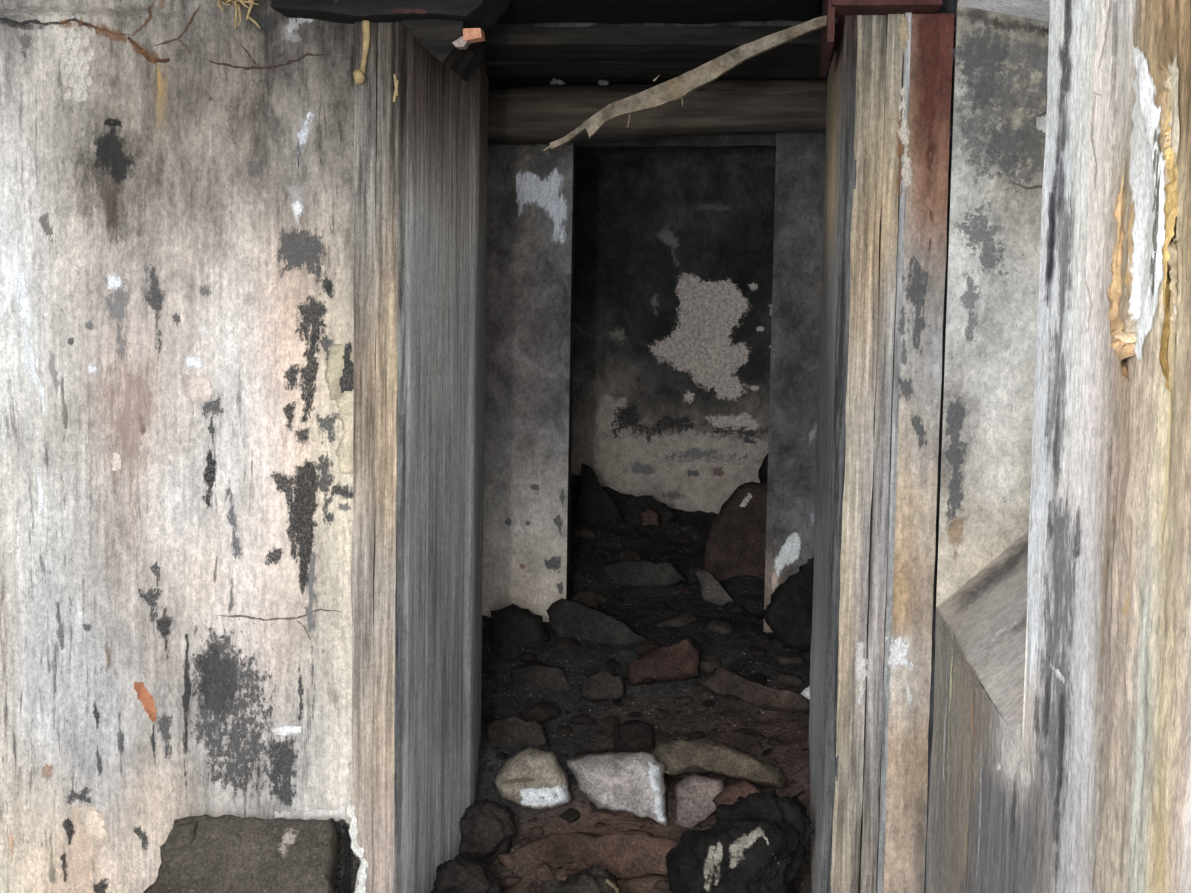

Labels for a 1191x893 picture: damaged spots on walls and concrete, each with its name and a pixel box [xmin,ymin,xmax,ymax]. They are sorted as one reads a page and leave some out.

crack [0,3,324,70]
water stain [103,192,117,227]
crack [1010,181,1042,189]
spalling [1124,48,1180,361]
peeling [650,226,759,404]
peeling [324,342,354,474]
peeling [705,413,759,432]
water stain [1046,500,1054,544]
water stain [1033,676,1063,890]